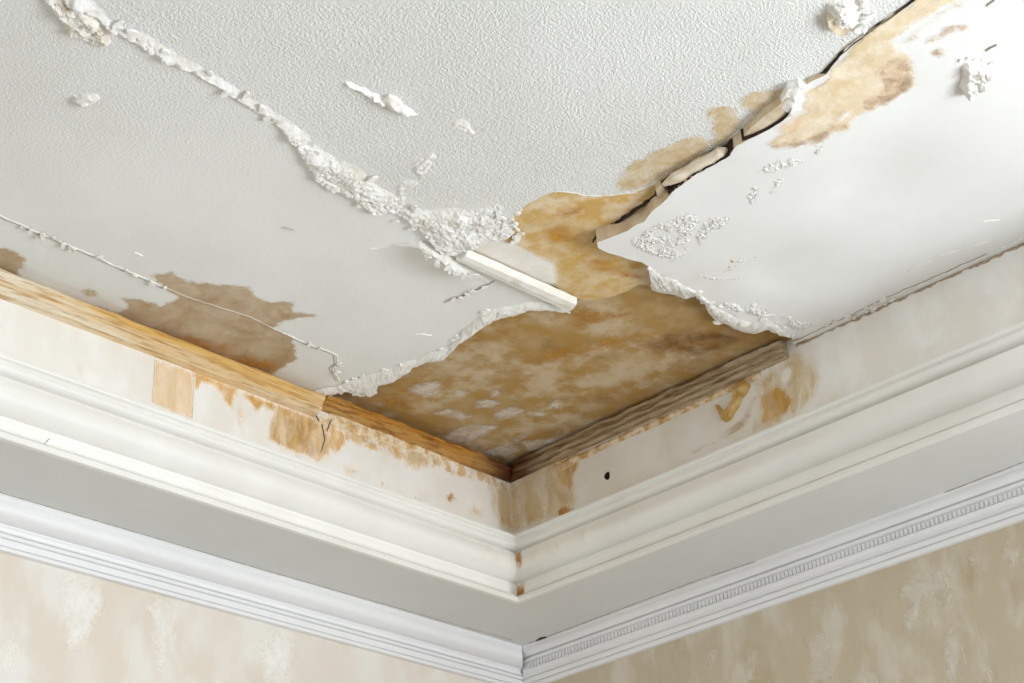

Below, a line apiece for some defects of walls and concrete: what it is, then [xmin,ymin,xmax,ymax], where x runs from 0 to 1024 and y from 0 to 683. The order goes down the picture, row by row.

flaking render [825,0,877,36]
damp [772,0,955,149]
crack [819,0,915,74]
flaking render [959,56,1000,101]
flaking render [44,0,826,350]
crack [592,108,792,243]
crack [0,215,342,381]
damp [105,273,314,374]
damp [249,396,576,528]
flaking render [313,302,616,405]
flaking render [440,390,560,442]
damp [762,357,815,424]